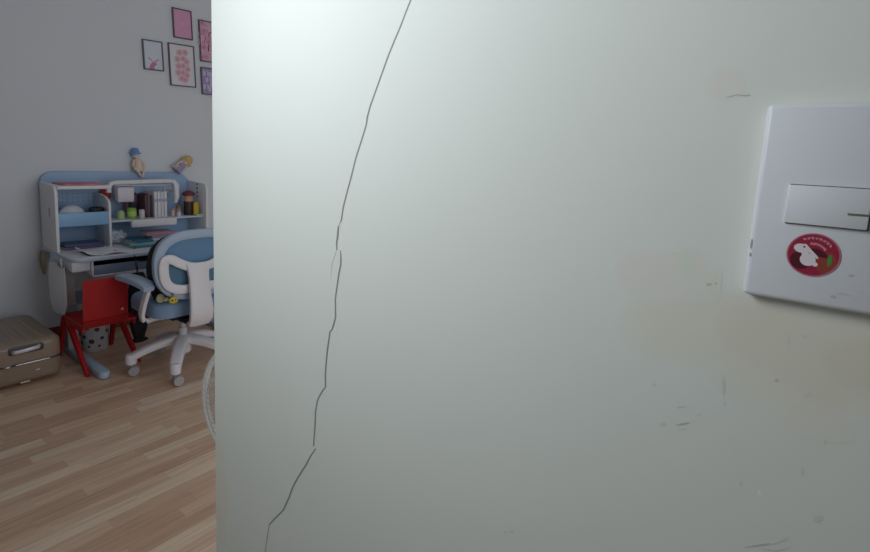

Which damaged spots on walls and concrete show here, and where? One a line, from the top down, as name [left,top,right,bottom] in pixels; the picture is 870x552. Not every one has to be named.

crack [265,0,411,552]